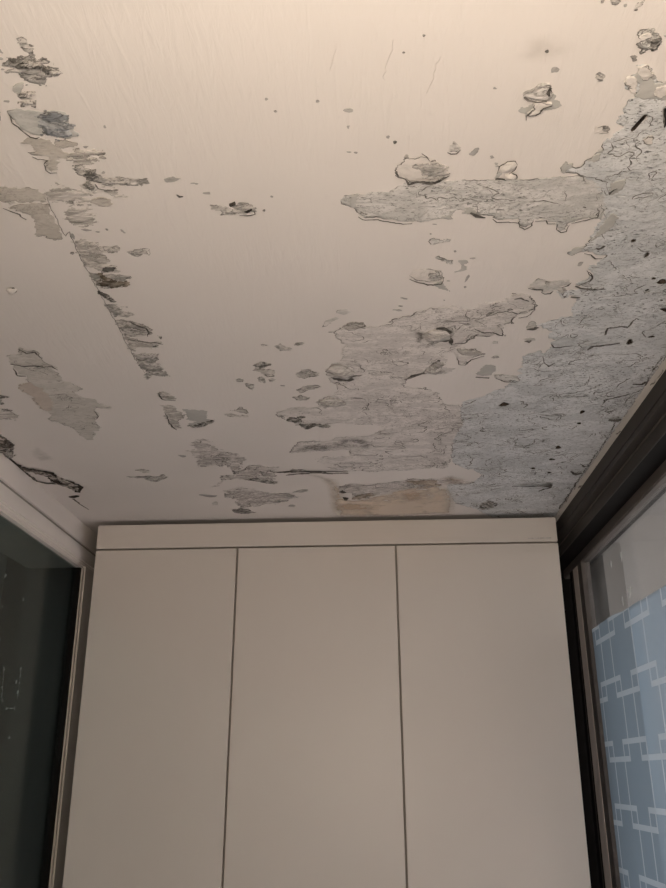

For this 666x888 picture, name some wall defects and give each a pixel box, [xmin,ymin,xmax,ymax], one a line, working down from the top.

peeling [601,0,645,11]
flaking render [0,37,168,380]
peeling [178,28,666,518]
peeling [7,347,112,440]
peeling [0,395,19,421]
peeling [157,391,214,430]
flaking render [0,435,16,459]
flaking render [20,467,81,492]
damp [337,487,449,515]